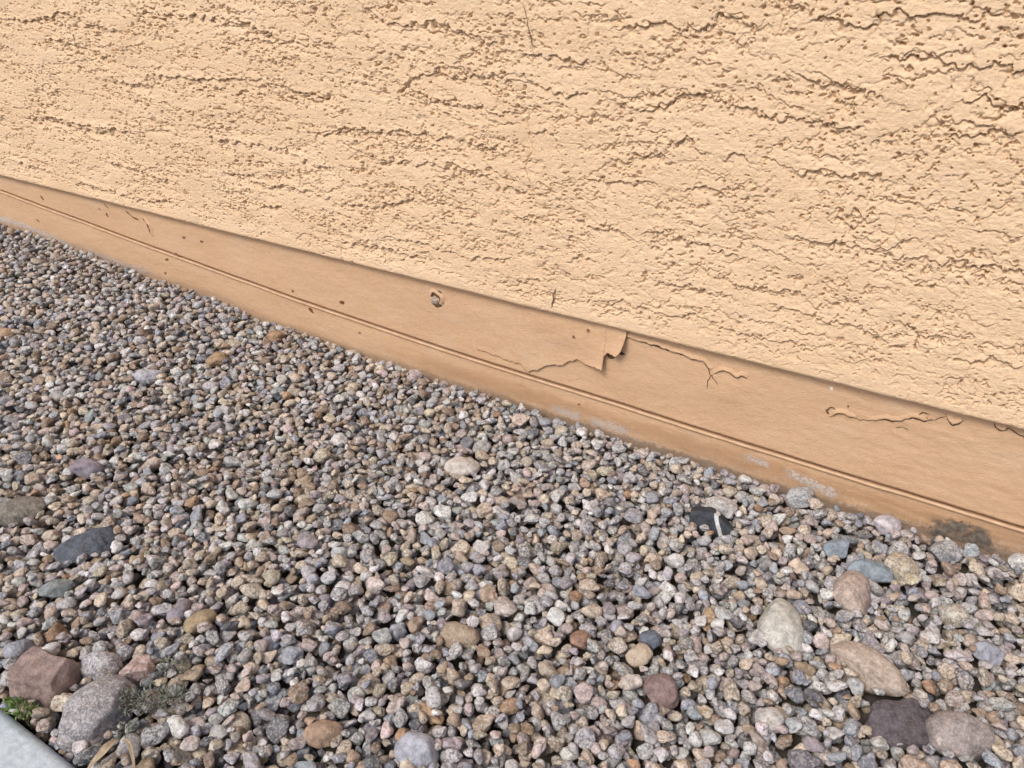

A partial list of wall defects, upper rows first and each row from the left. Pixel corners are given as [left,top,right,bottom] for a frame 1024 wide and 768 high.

peeling [476,294,627,372]
crack [626,333,749,390]
crack [825,407,963,430]
crack [994,423,1024,437]